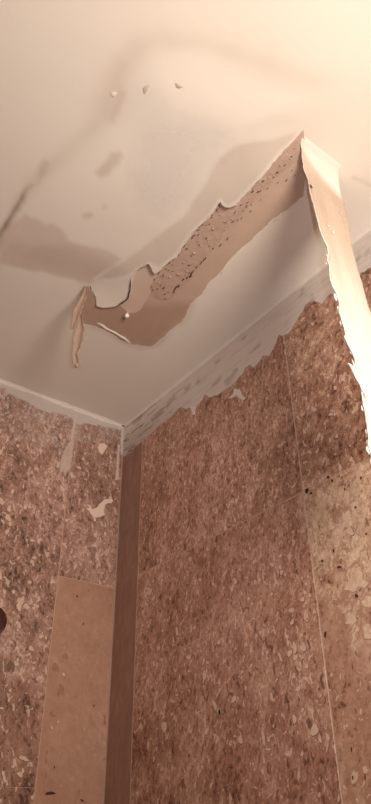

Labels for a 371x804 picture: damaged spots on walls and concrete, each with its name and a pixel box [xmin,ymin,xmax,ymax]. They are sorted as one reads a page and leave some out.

peeling [71,130,371,461]